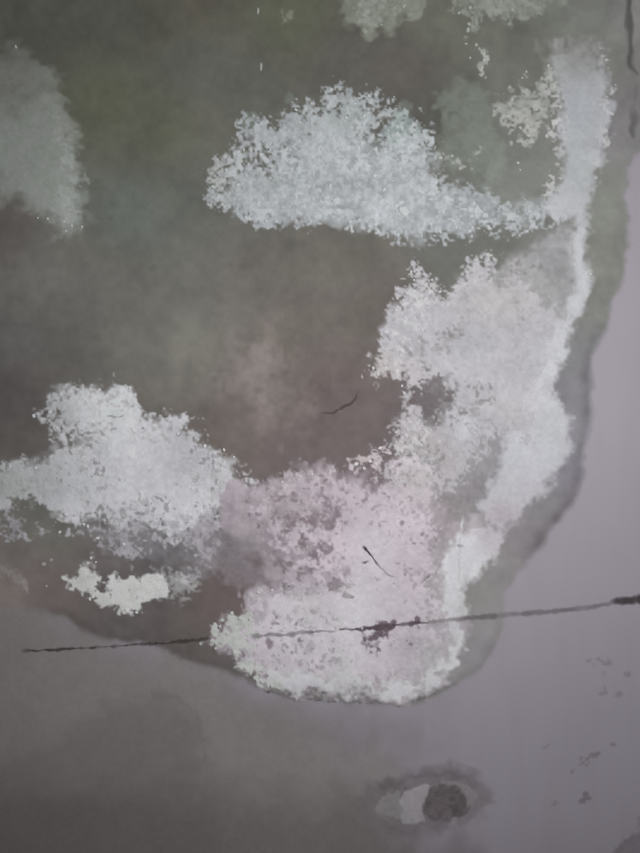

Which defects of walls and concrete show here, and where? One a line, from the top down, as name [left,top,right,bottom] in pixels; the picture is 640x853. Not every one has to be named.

crack [614,595,640,604]
crack [466,612,496,620]
crack [340,616,426,653]
crack [124,637,208,646]
crack [30,645,95,653]
water stain [0,493,408,853]
flaking render [356,764,490,835]